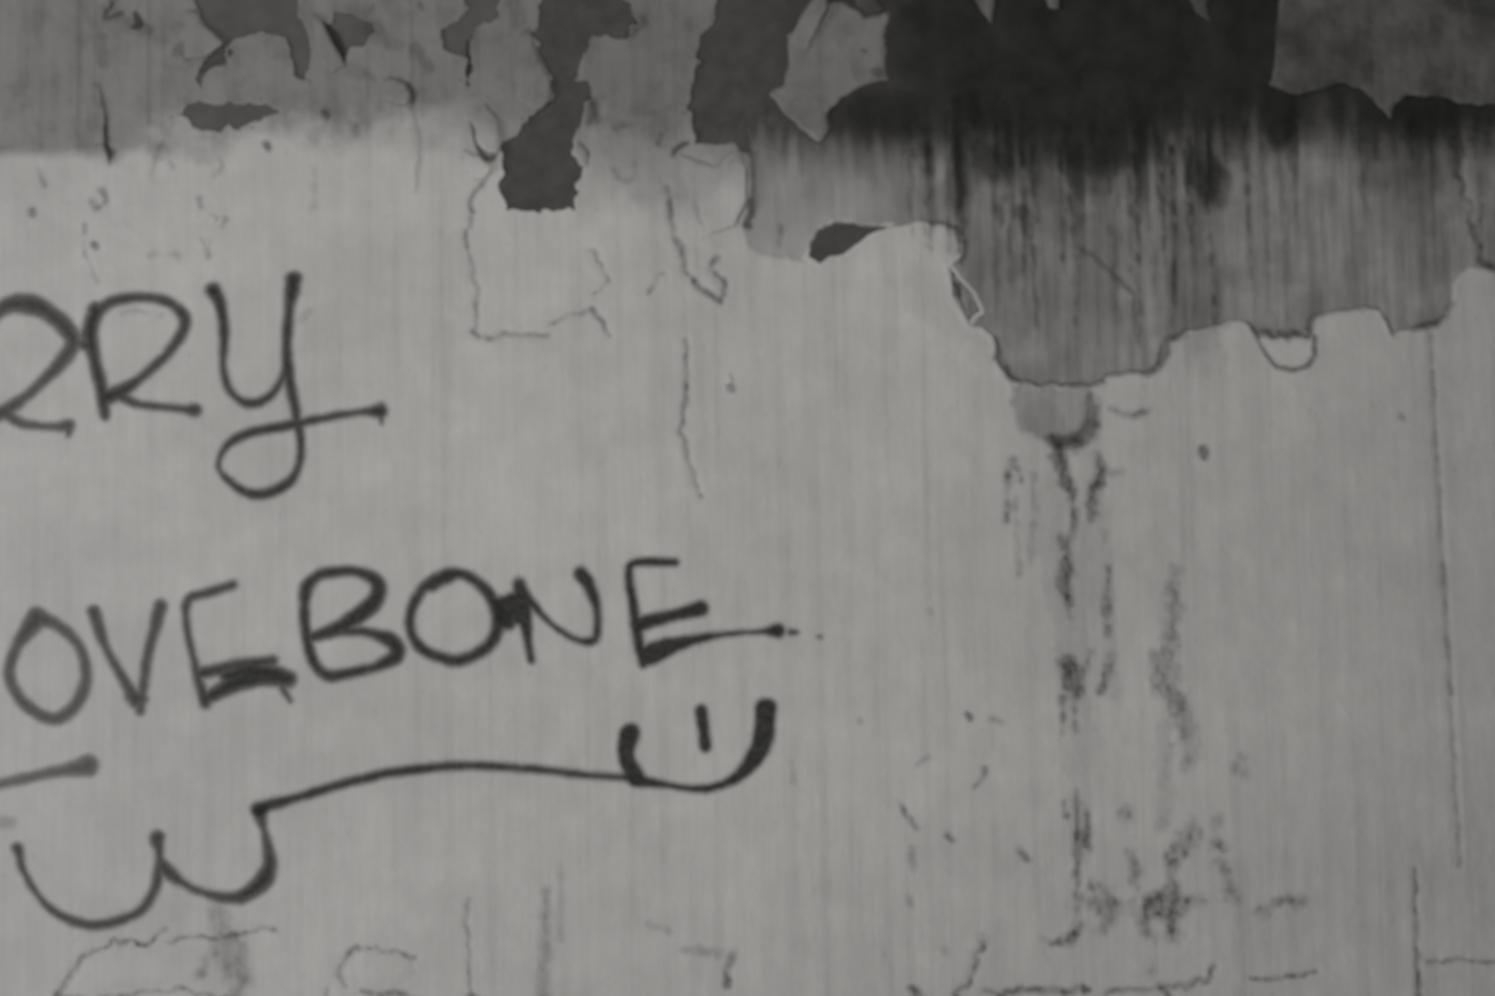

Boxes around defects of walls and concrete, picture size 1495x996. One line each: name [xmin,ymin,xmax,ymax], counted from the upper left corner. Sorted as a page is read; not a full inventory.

peeling [163,0,385,140]
peeling [432,0,648,222]
peeling [678,0,1495,393]
leakage [902,0,1307,179]
leakage [1195,160,1223,201]
leakage [1407,95,1492,134]
leakage [1056,413,1103,517]